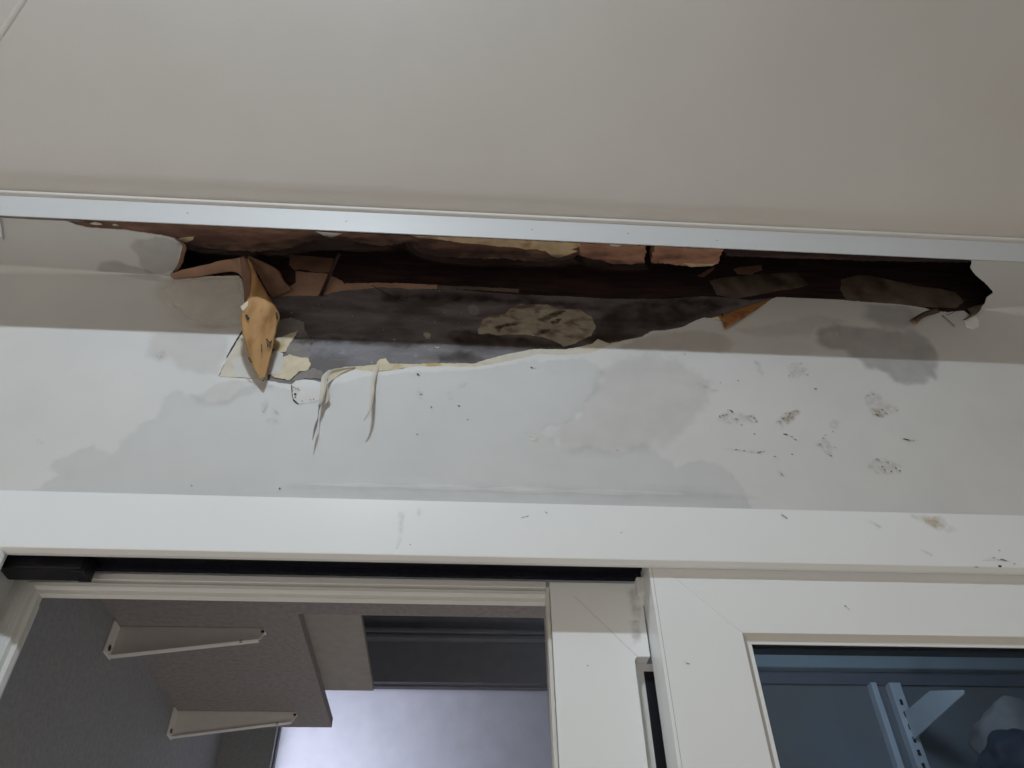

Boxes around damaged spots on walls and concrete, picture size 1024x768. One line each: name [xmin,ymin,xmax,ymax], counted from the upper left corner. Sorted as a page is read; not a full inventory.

peeling [411,235,580,258]
peeling [260,253,808,384]
peeling [840,275,979,329]